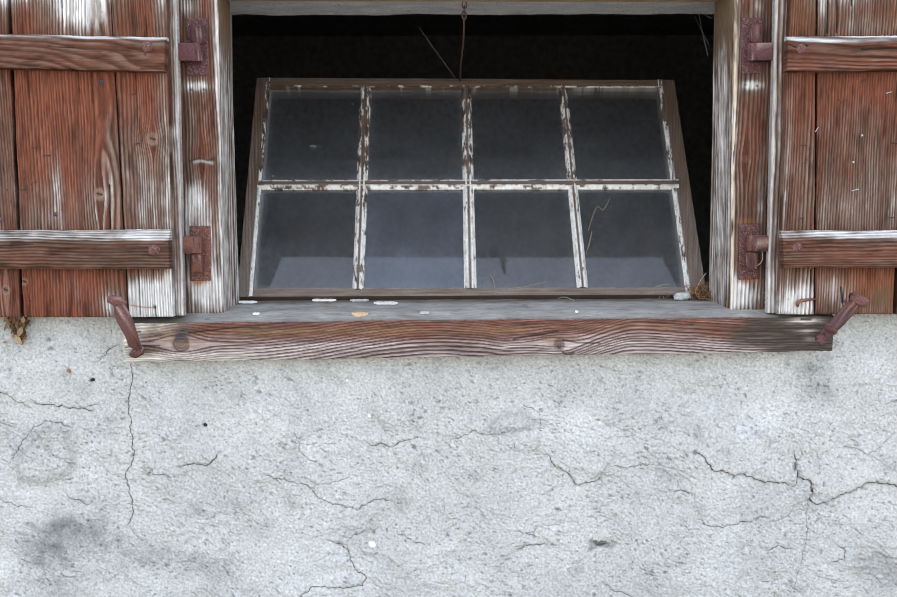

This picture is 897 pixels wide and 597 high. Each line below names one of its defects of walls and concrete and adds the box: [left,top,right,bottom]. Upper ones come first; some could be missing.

crack [0,392,99,463]
crack [265,434,391,509]
crack [684,453,897,586]
crack [304,529,428,594]